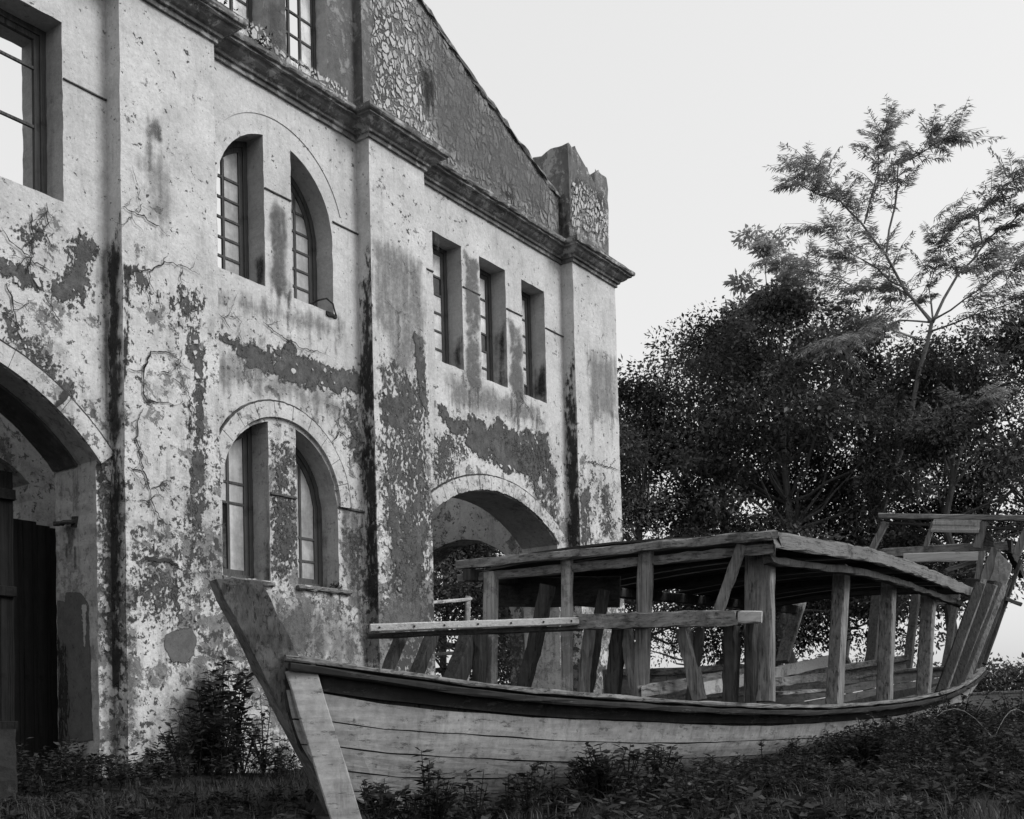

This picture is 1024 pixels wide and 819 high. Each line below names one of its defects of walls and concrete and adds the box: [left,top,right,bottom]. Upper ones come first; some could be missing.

flaking render [3,217,53,254]
crack [1,204,62,334]
flaking render [0,302,81,426]
flaking render [0,227,100,314]
flaking render [97,264,210,663]
crack [113,166,199,312]
water stain [149,122,169,219]
crack [127,350,204,567]
flaking render [219,324,363,467]
water stain [257,205,340,337]
water stain [376,243,423,369]
flaking render [375,331,560,606]